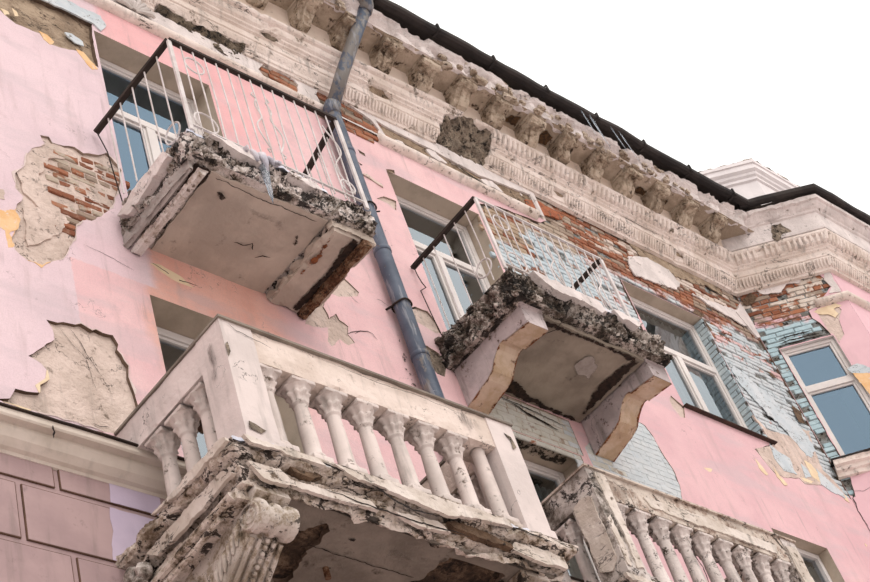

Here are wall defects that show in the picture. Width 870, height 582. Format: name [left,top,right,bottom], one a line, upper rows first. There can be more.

flaking render [0,0,106,70]
spalling [436,53,693,199]
flaking render [0,137,130,268]
corrosion [300,240,330,274]
flaking render [3,322,136,433]
flaking render [477,190,855,503]
spalling [272,523,329,579]
spalling [411,558,504,582]